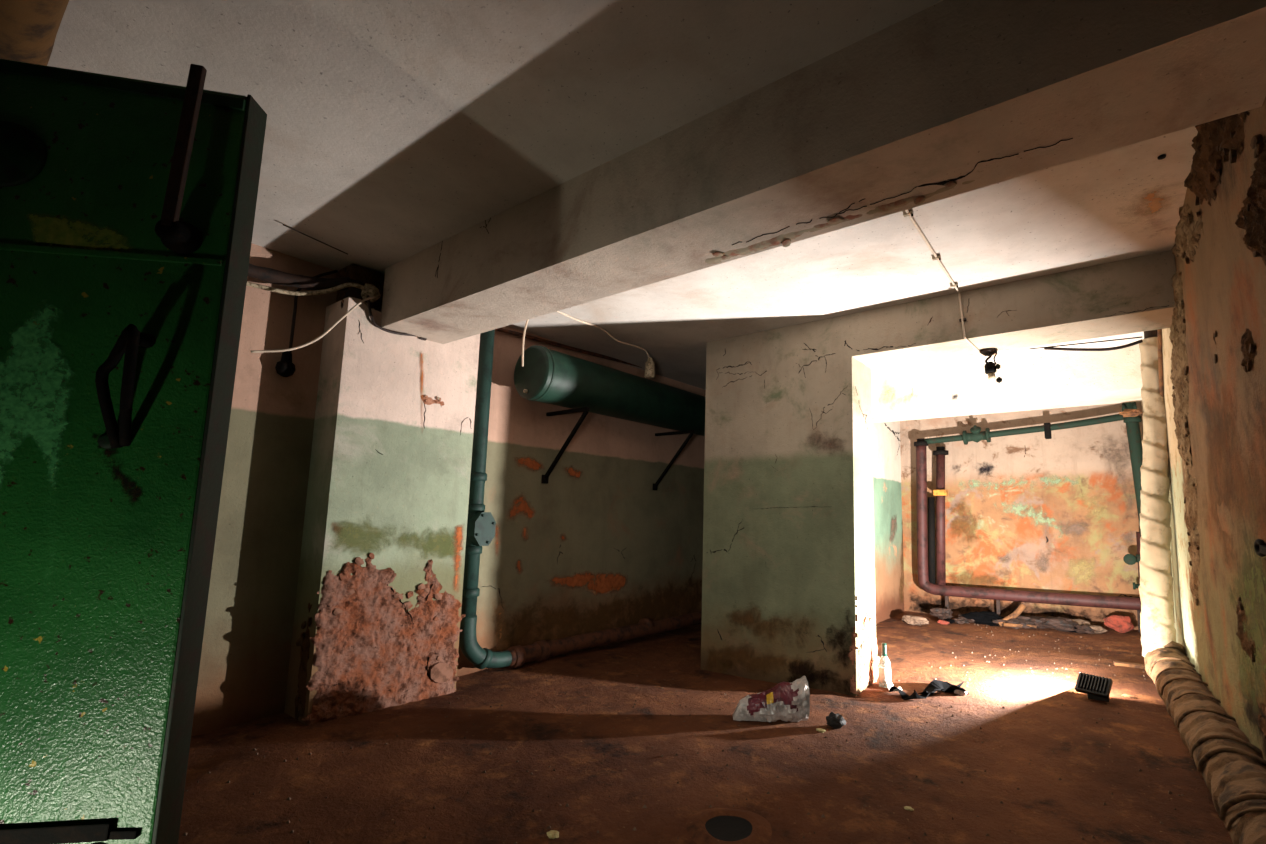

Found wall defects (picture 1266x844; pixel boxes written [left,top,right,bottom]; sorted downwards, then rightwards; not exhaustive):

crack [732,138,1073,245]
crack [716,350,766,389]
crack [796,318,932,455]
spalling [1169,111,1266,606]
peeling [551,572,627,595]
spalling [295,553,466,726]
water stain [707,616,854,693]